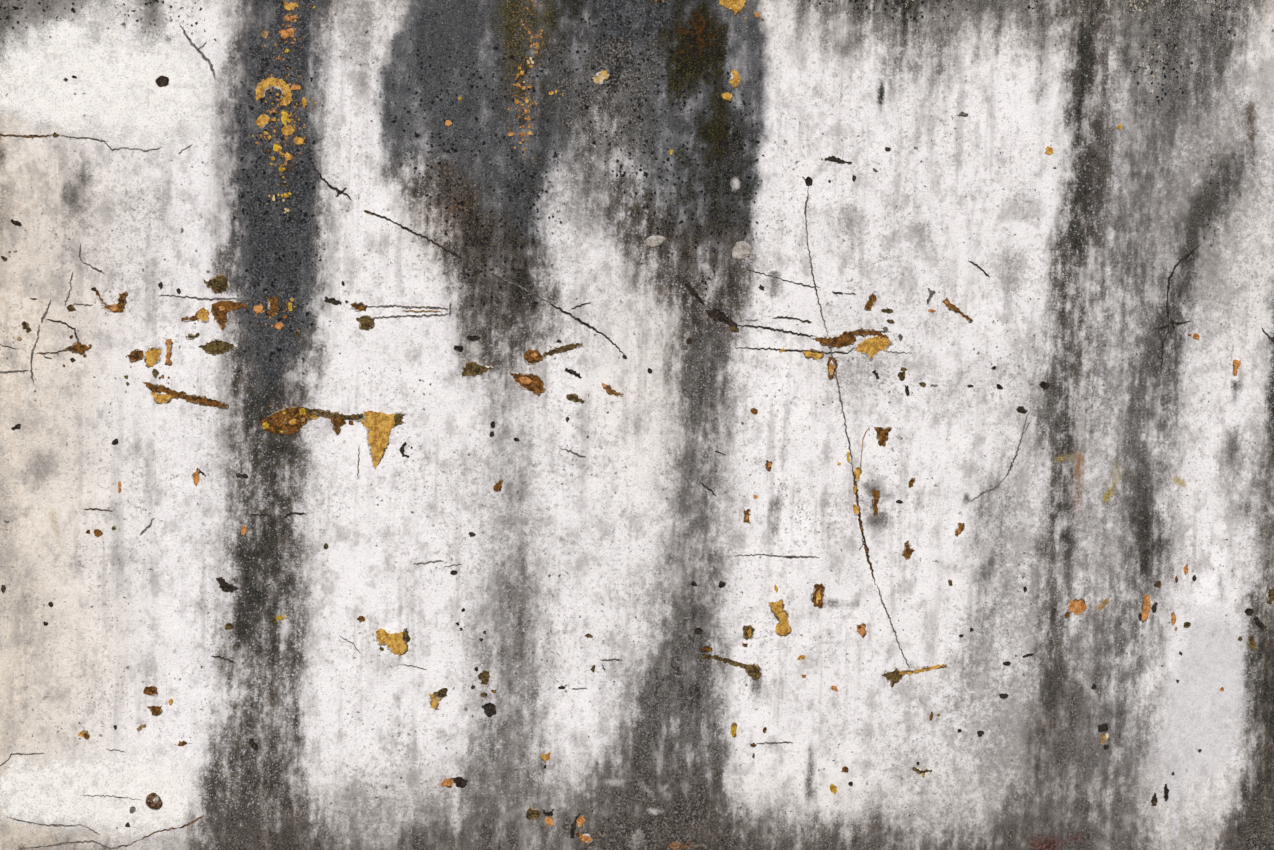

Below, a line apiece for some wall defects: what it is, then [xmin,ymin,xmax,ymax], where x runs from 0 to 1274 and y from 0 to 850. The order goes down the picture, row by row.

water stain [0,0,202,52]
peeling [124,274,300,410]
peeling [803,293,903,380]
crack [1156,244,1201,374]
water stain [188,0,335,850]
peeling [259,405,413,469]
water stain [371,0,1263,850]
crack [801,176,911,669]
crack [969,411,1031,502]
peeling [376,628,410,656]
peeling [768,585,792,636]
water stain [1216,495,1274,850]